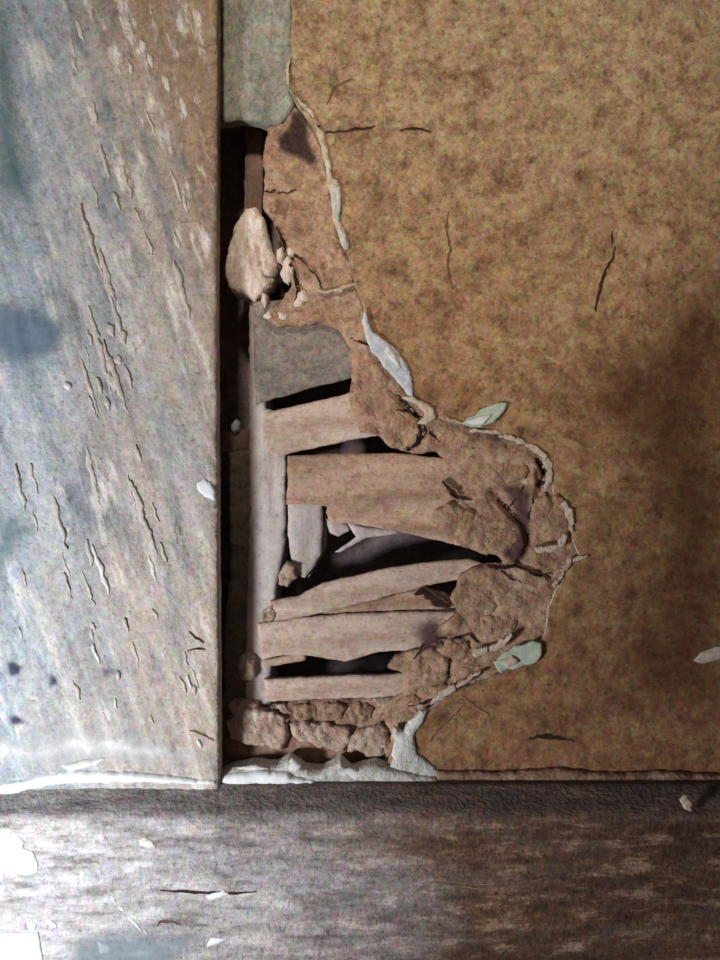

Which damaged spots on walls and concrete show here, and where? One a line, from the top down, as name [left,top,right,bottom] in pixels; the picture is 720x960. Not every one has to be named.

crack [327,79,354,104]
crack [325,125,375,134]
crack [399,125,431,133]
crack [444,211,453,289]
crack [594,231,616,311]
flaking render [263,59,588,777]
crack [187,631,206,652]
crack [189,730,214,741]
crack [529,732,575,743]
crack [160,888,256,896]